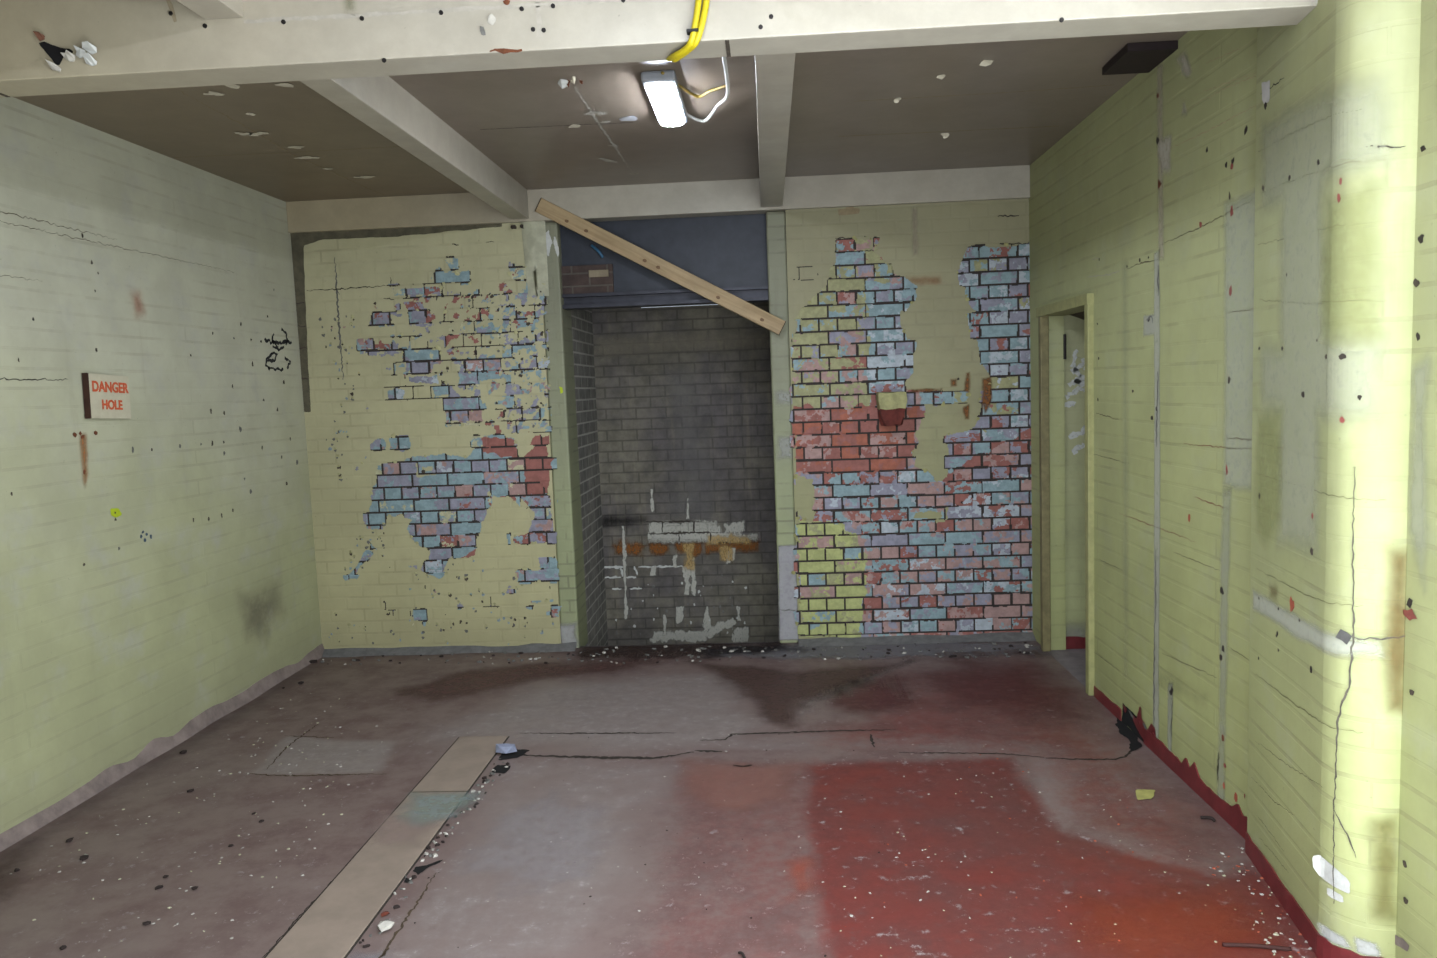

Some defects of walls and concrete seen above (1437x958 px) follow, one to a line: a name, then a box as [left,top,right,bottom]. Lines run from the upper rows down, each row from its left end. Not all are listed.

crack [1,211,225,271]
crack [0,375,68,383]
rust [73,431,98,483]
peeling [318,256,562,645]
peeling [789,235,1033,638]
peeling [646,519,759,544]
crack [1096,372,1405,896]
crack [524,729,1132,767]